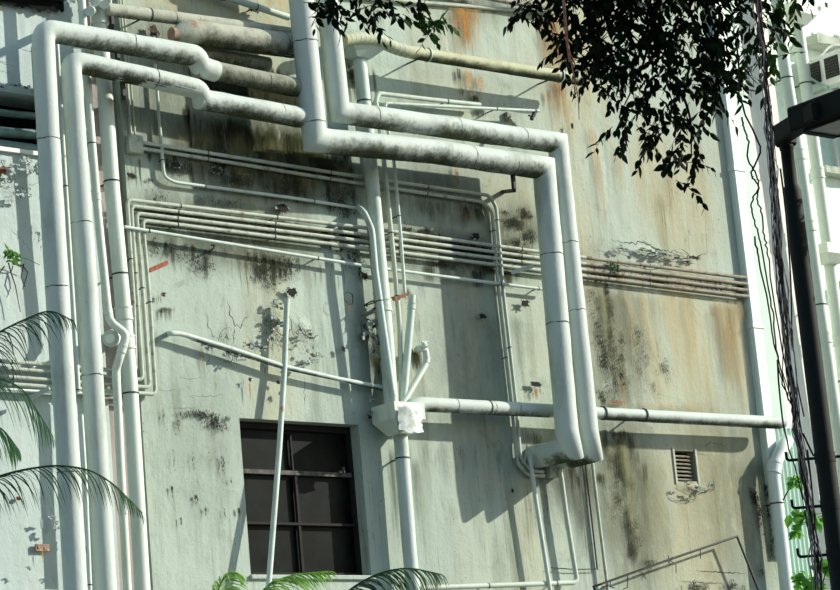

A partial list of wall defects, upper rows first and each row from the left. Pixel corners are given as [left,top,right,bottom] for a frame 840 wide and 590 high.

leakage [56,31,583,218]
peeling [0,156,39,198]
leakage [138,154,369,278]
leakage [240,252,301,290]
leakage [403,207,536,286]
peeling [638,247,702,264]
crack [227,300,273,374]
peeling [243,299,283,351]
peeling [296,349,325,368]
peeling [362,319,381,360]
leakage [175,409,230,435]
leakage [545,270,781,570]